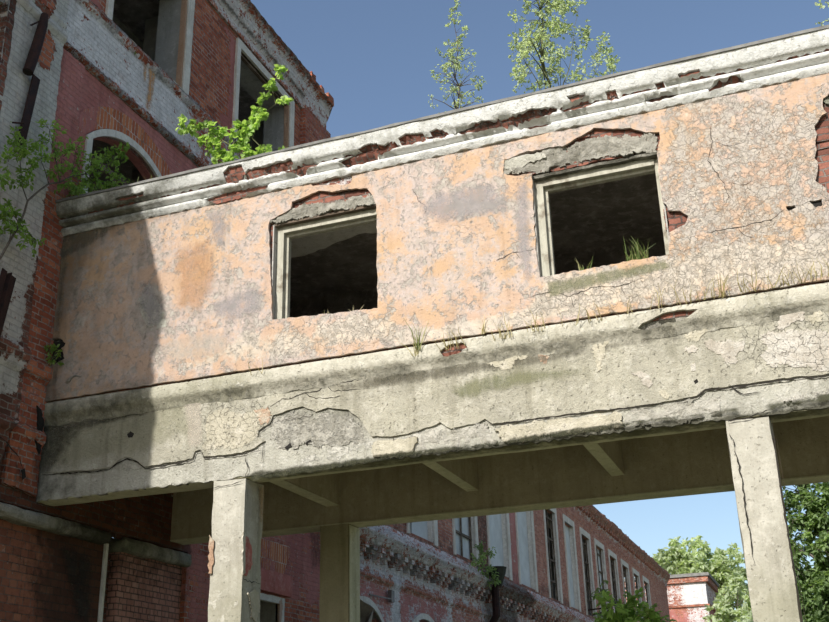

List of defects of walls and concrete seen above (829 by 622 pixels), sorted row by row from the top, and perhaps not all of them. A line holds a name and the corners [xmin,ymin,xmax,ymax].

flaking render [207,160,317,204]
flaking render [313,95,592,186]
flaking render [504,129,658,183]
crack [707,126,751,206]
flaking render [816,134,829,150]
flaking render [270,194,376,228]
crack [711,210,783,238]
peeling [760,310,829,372]
flaking render [202,371,722,459]
spalling [783,389,829,402]
crack [486,375,829,597]